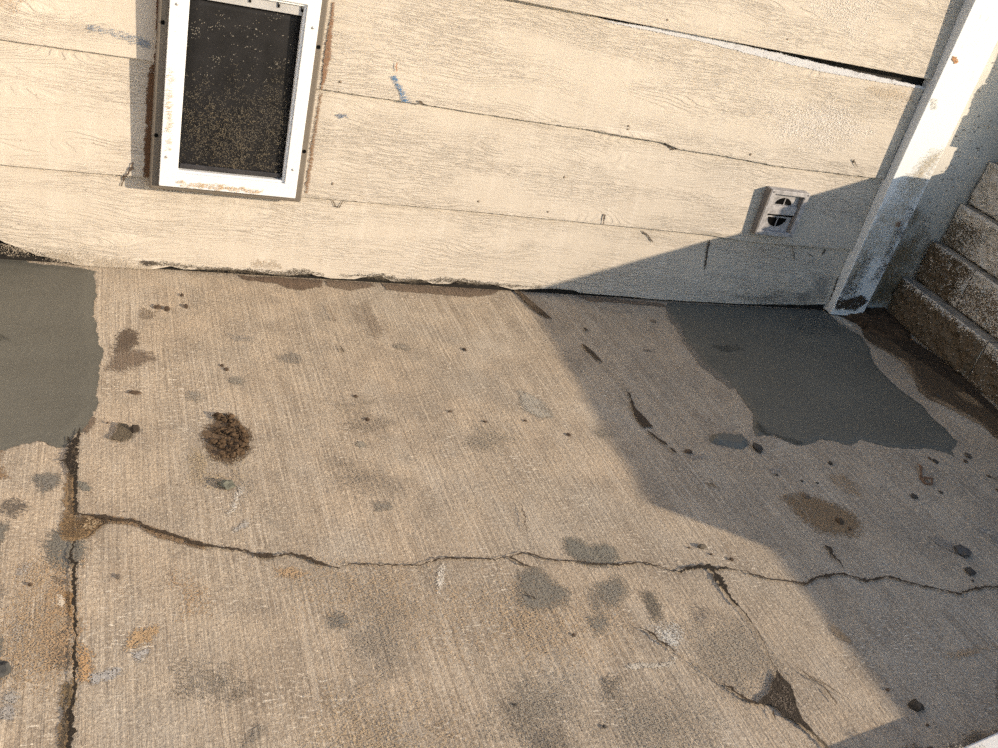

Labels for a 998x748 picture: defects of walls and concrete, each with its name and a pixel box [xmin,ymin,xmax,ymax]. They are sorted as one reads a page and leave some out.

water stain [847,148,998,405]
water stain [104,328,158,375]
water stain [27,472,64,495]
water stain [39,527,91,587]
crack [59,428,998,748]